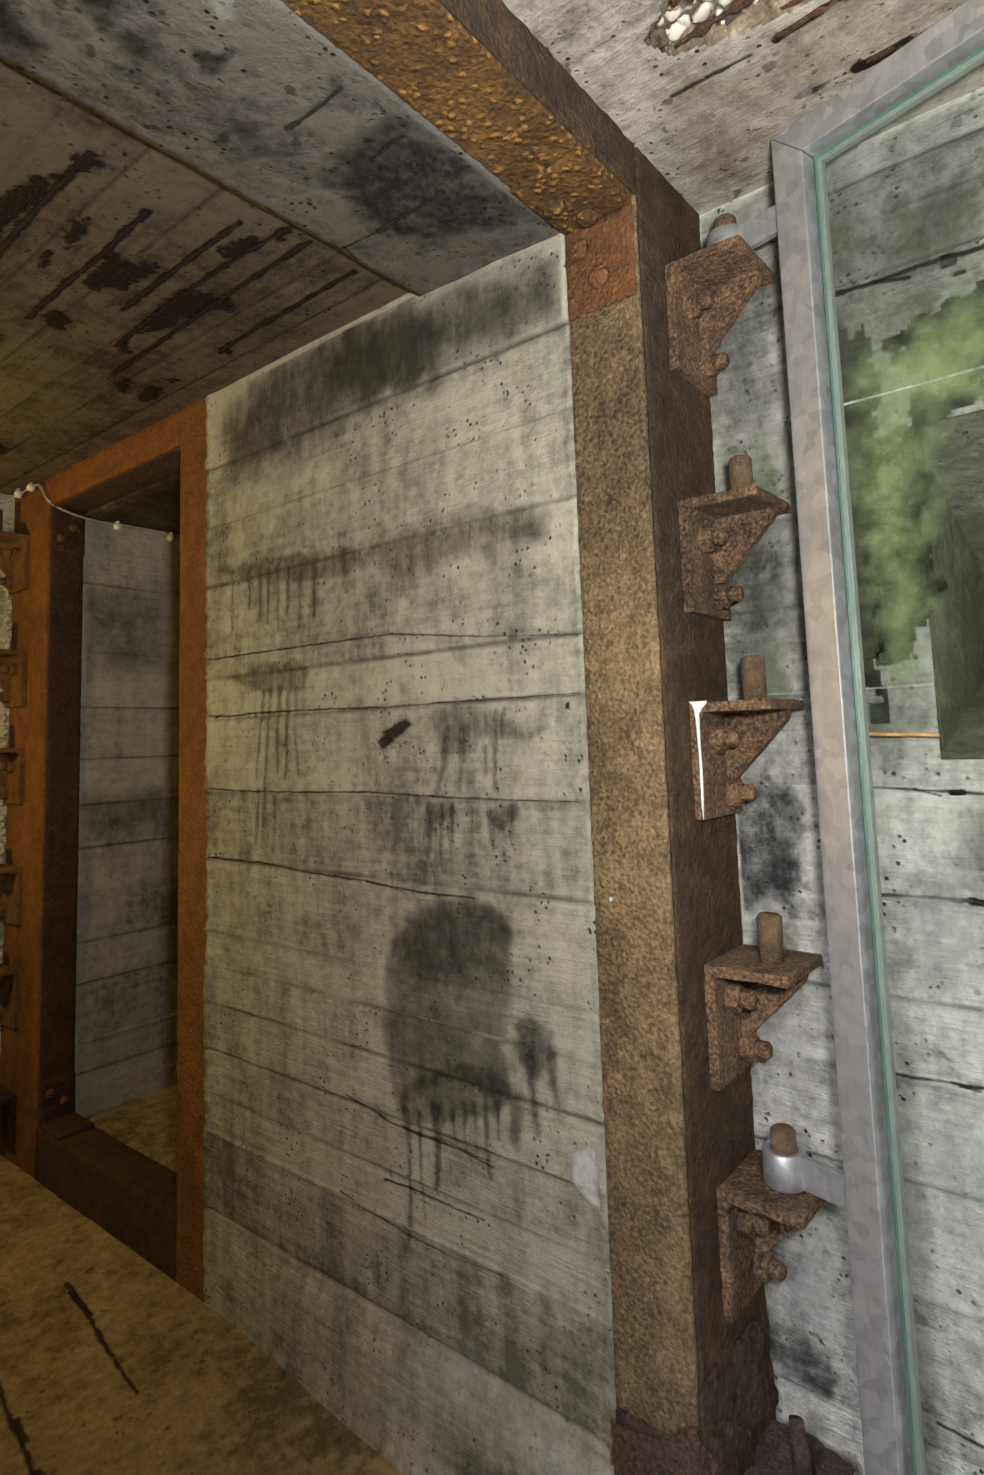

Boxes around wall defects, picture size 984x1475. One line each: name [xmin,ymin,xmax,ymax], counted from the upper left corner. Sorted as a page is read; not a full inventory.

spalling [644,0,843,57]
spalling [850,32,923,73]
damp [230,267,552,468]
damp [403,907,556,1140]
crack [64,1282,139,1394]
crack [0,1383,46,1475]
rust [611,1314,772,1475]